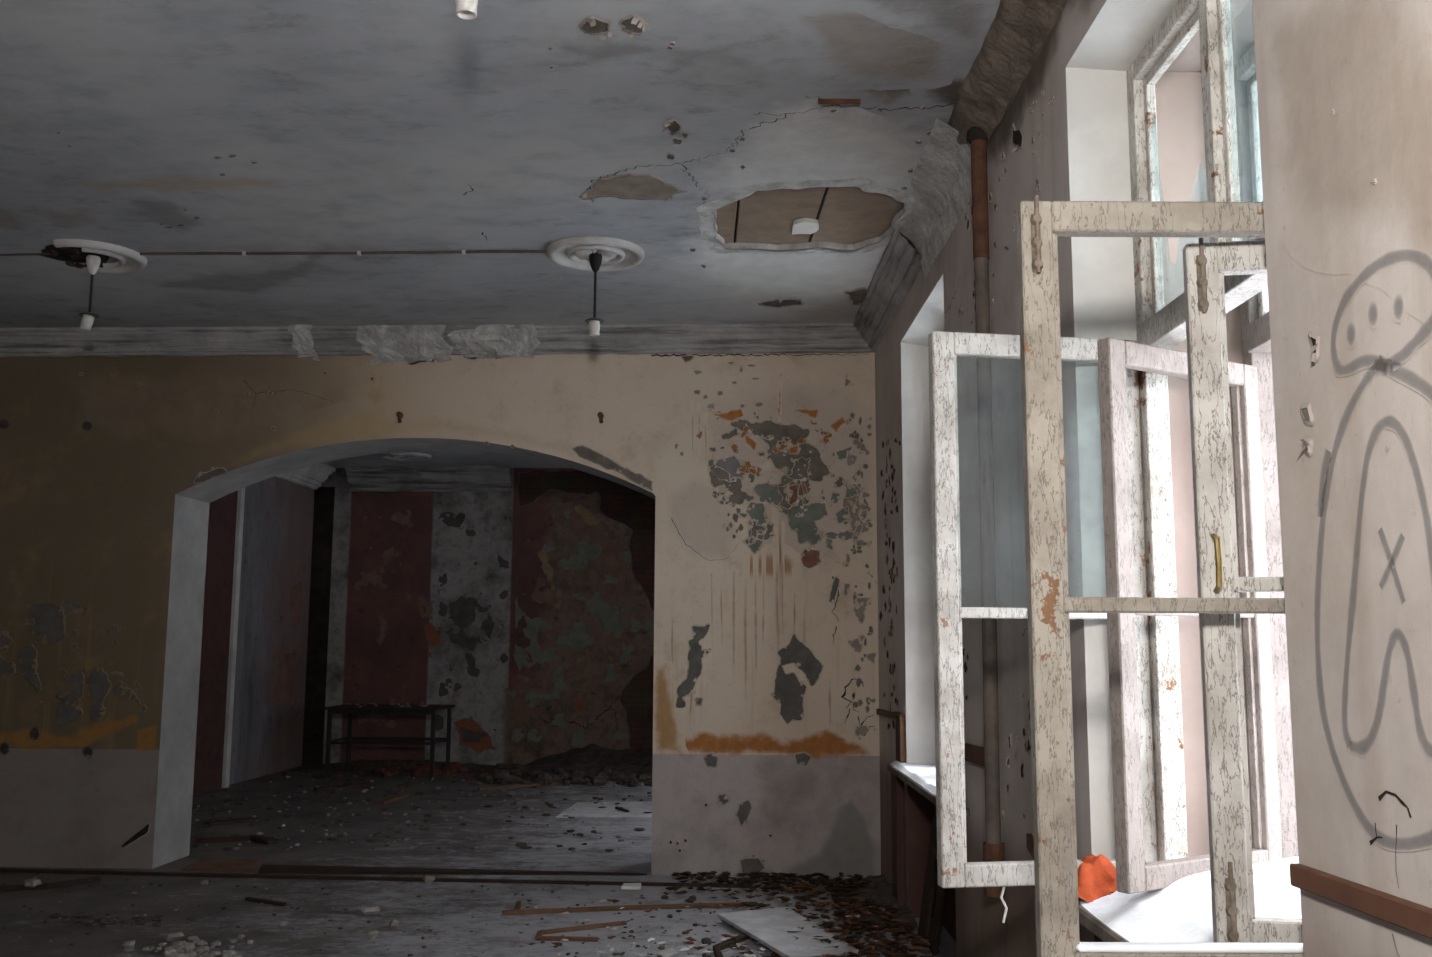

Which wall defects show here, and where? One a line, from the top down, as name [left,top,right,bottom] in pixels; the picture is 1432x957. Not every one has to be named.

peeling [578,14,650,40]
flaking render [579,137,914,268]
crack [577,96,953,207]
peeling [439,512,476,537]
flaking render [504,445,655,613]
peeling [681,355,901,738]
peeling [435,714,496,755]
peeling [417,555,519,697]
flaking render [620,654,654,751]
peeling [675,623,711,708]